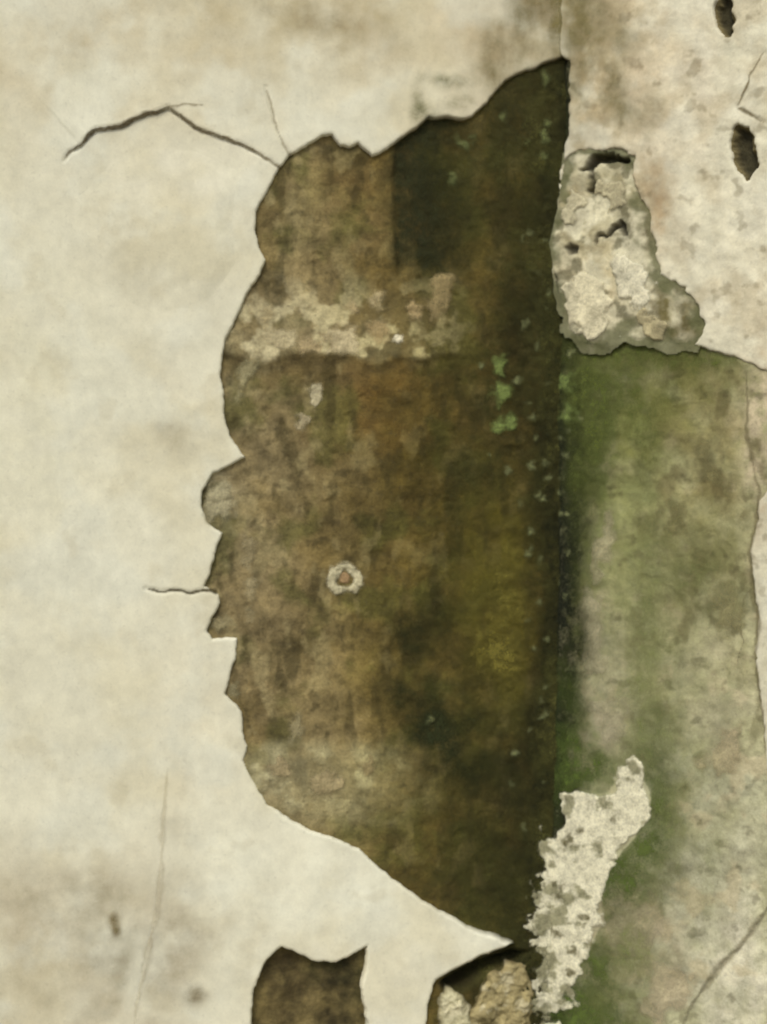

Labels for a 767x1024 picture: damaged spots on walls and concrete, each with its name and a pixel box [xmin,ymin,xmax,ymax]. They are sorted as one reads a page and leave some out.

spalling [715,0,736,38]
crack [66,104,278,166]
spalling [201,59,767,1024]
crack [149,587,217,595]